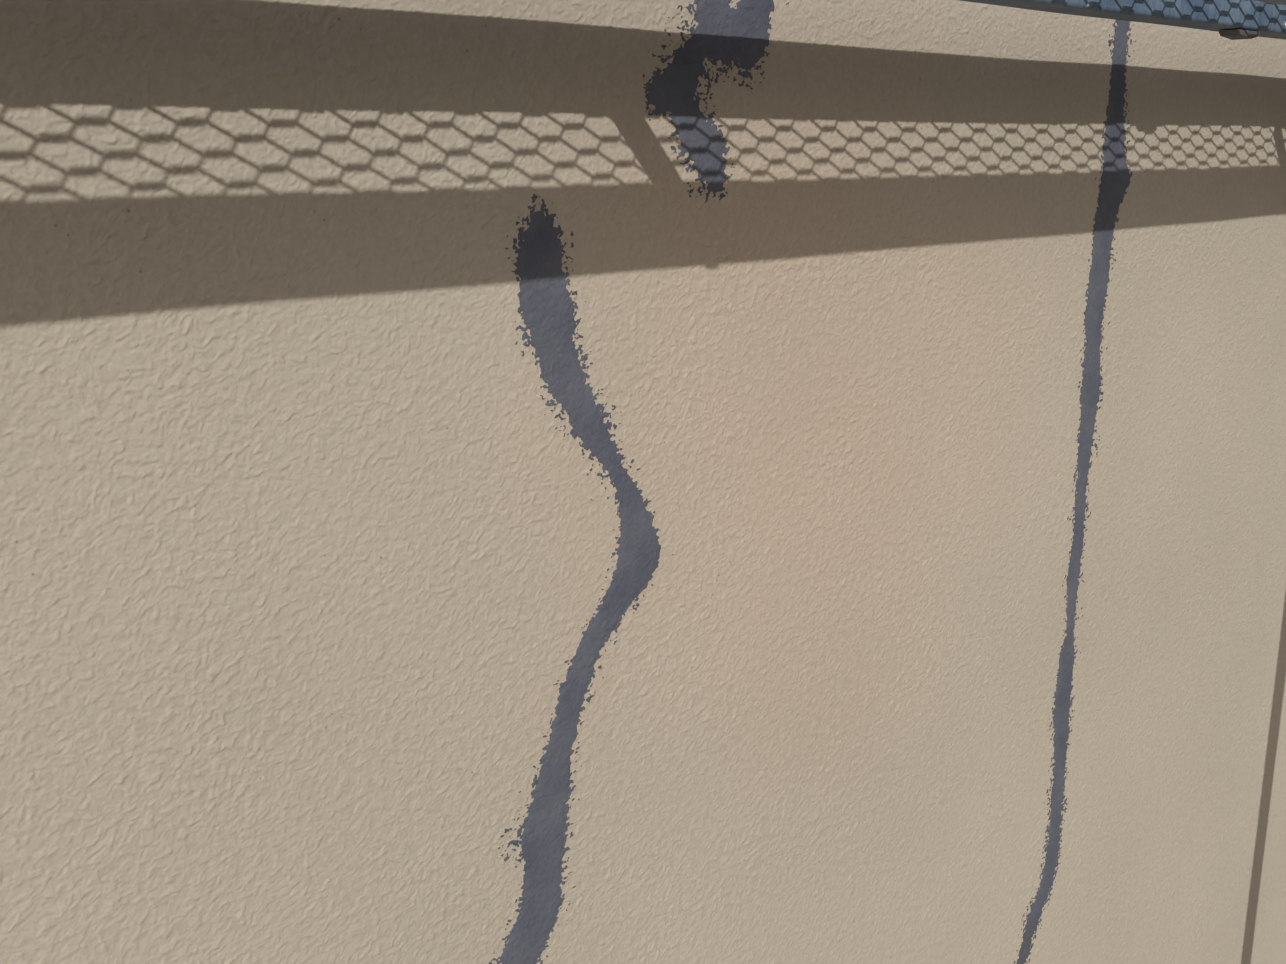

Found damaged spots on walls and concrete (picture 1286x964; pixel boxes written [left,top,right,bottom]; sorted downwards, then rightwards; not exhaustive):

crack [1016,929,1035,964]